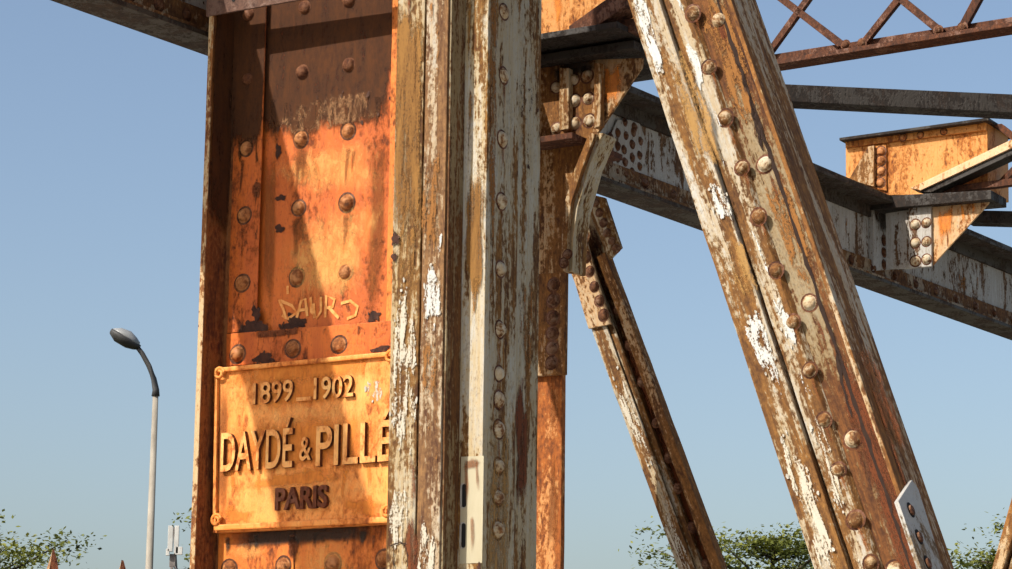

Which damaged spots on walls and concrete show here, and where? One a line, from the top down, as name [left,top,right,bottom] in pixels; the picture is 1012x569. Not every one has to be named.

peeling [633,0,664,74]
peeling [686,43,703,91]
rust [703,0,764,141]
rust [673,54,720,162]
spalling [390,232,400,261]
peeling [708,183,732,220]
rust [731,242,757,294]
rust [765,177,813,289]
peeling [773,298,796,349]
rust [250,359,365,408]
peeling [612,366,653,466]
rust [488,384,527,569]